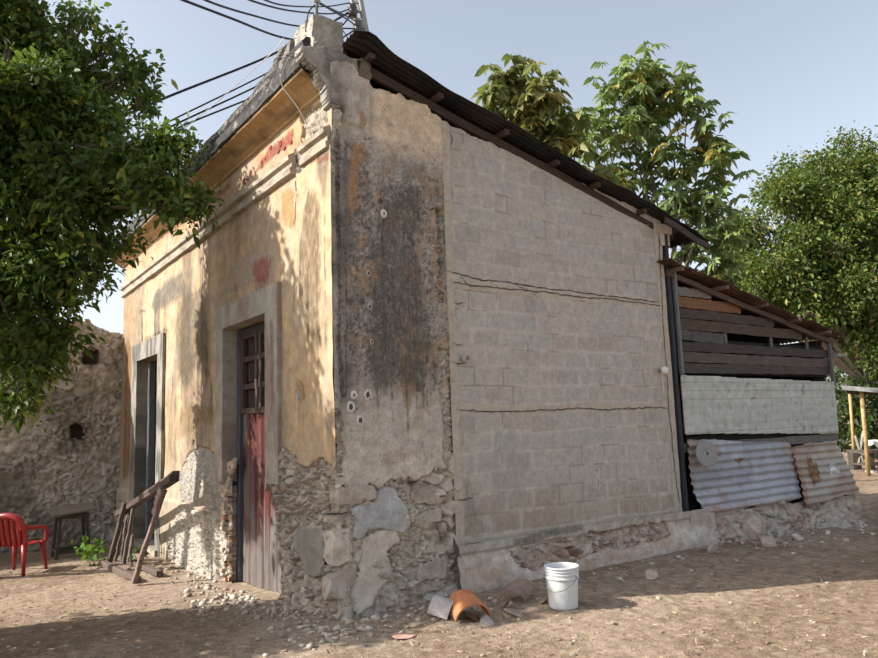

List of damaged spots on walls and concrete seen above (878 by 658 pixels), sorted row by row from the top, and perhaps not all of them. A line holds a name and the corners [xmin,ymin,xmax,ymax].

damp [335,134,365,250]
damp [150,274,208,384]
damp [370,189,434,394]
crack [450,239,680,502]
flaking render [165,446,237,583]
flaking render [272,348,462,621]
spalling [510,521,670,571]
rust [807,457,820,485]